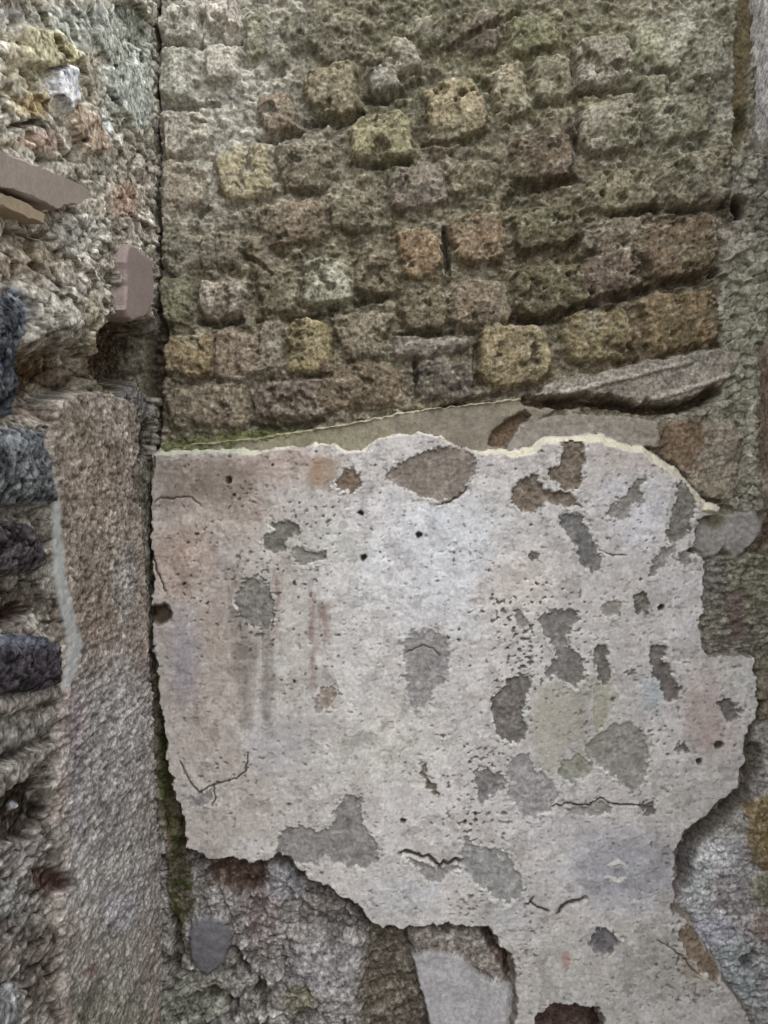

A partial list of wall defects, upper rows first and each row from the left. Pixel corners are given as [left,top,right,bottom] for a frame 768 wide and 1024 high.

spalling [153,410,768,661]
spalling [716,698,744,723]
crack [180,754,248,804]
crack [553,797,640,806]
crack [400,849,460,865]
peeling [604,858,628,885]
spalling [674,718,768,1024]
spalling [158,794,526,1024]
crack [528,897,585,913]
spalling [588,927,624,955]